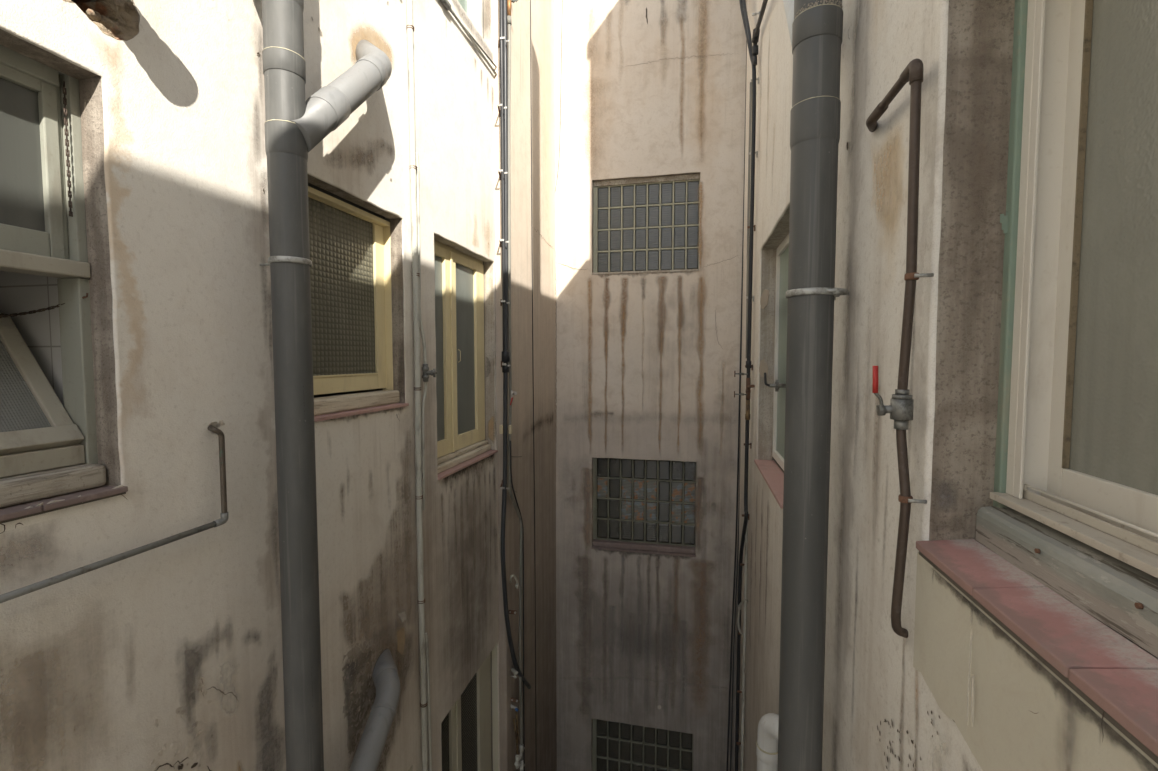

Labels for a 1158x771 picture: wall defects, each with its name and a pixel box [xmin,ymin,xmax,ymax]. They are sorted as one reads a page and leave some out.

spalling [63,0,140,41]
damp [184,644,209,710]